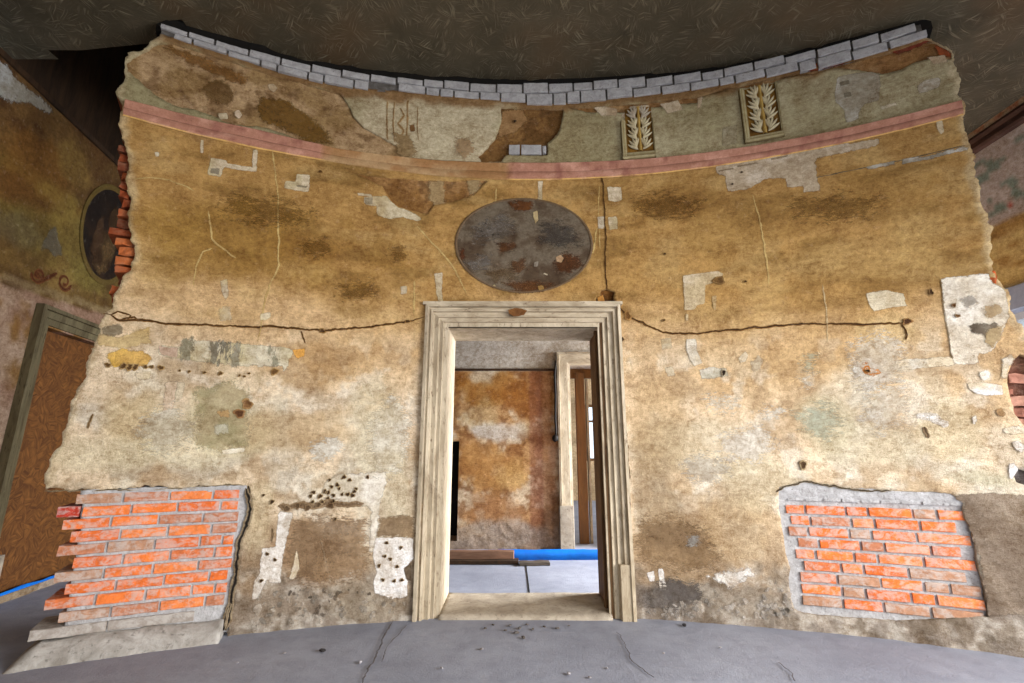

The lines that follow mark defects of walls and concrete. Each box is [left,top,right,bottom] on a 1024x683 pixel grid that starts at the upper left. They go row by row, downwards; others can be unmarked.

spalling [479,109,563,162]
spalling [108,145,135,303]
crack [601,178,914,340]
crack [103,311,423,343]
spalling [262,474,369,521]
spalling [377,541,412,583]